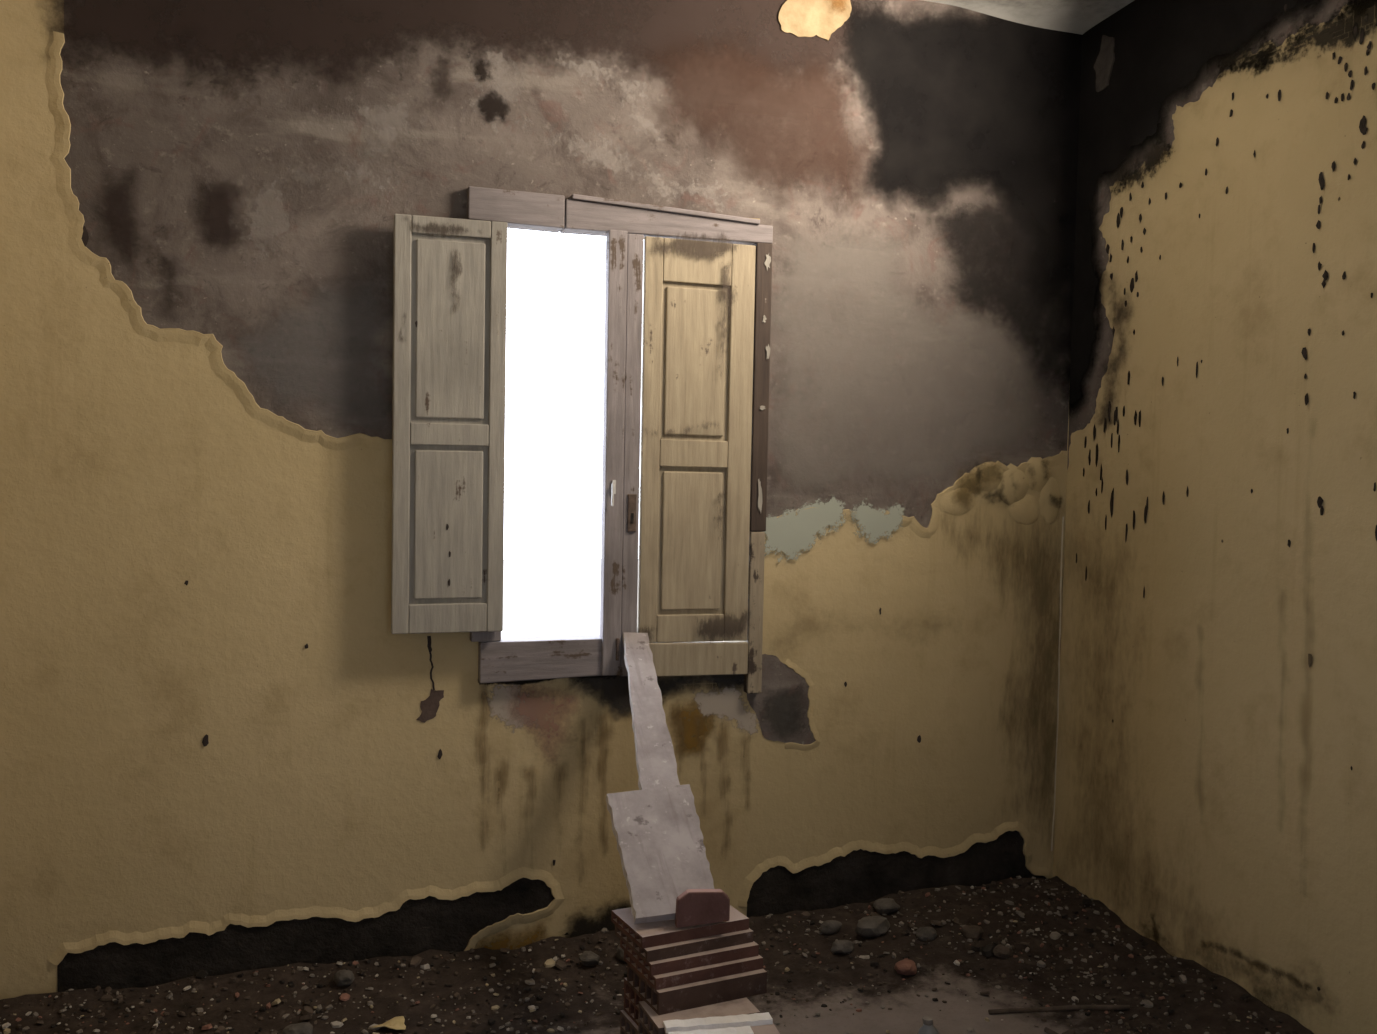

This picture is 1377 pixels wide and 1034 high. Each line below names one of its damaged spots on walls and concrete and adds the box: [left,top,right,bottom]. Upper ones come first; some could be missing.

peeling [45,0,1353,538]
water stain [1083,402,1165,543]
water stain [482,684,575,752]
water stain [672,702,726,756]
flaking render [747,654,821,751]
water stain [1002,539,1061,796]
flaking render [47,867,564,992]
flaking render [738,821,1050,917]